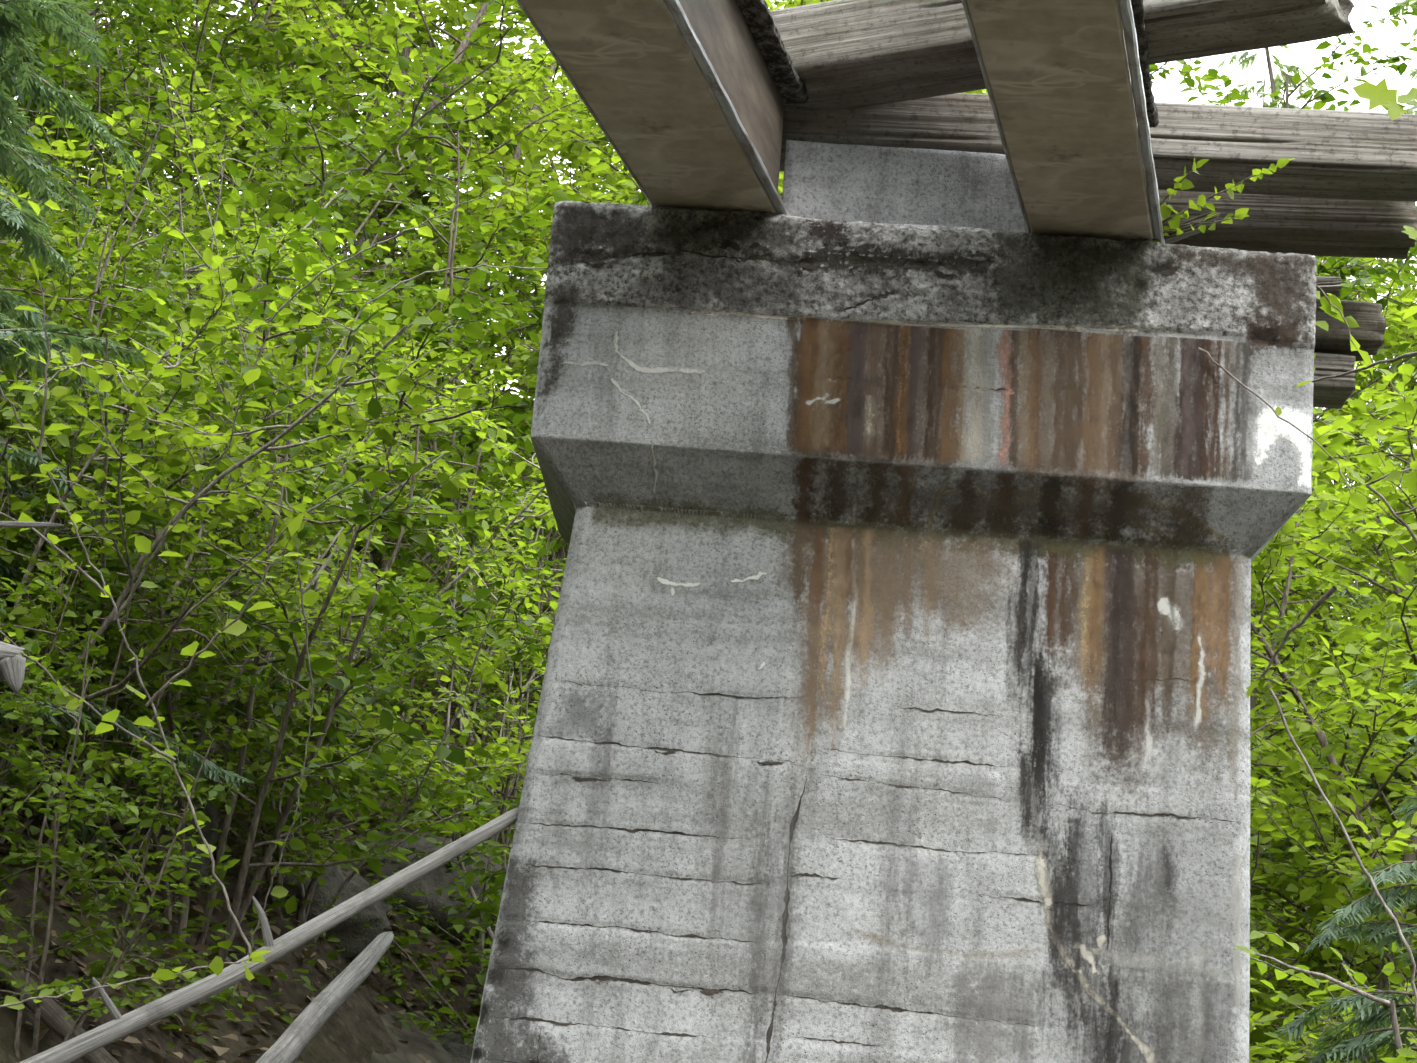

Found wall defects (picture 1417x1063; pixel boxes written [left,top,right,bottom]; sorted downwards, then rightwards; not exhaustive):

damp [842,591,858,734]
corrosion [782,317,1238,783]
damp [1017,541,1053,781]
damp [1143,698,1153,765]
damp [1157,598,1180,630]
damp [1195,637,1206,726]
crack [485,735,1245,1063]